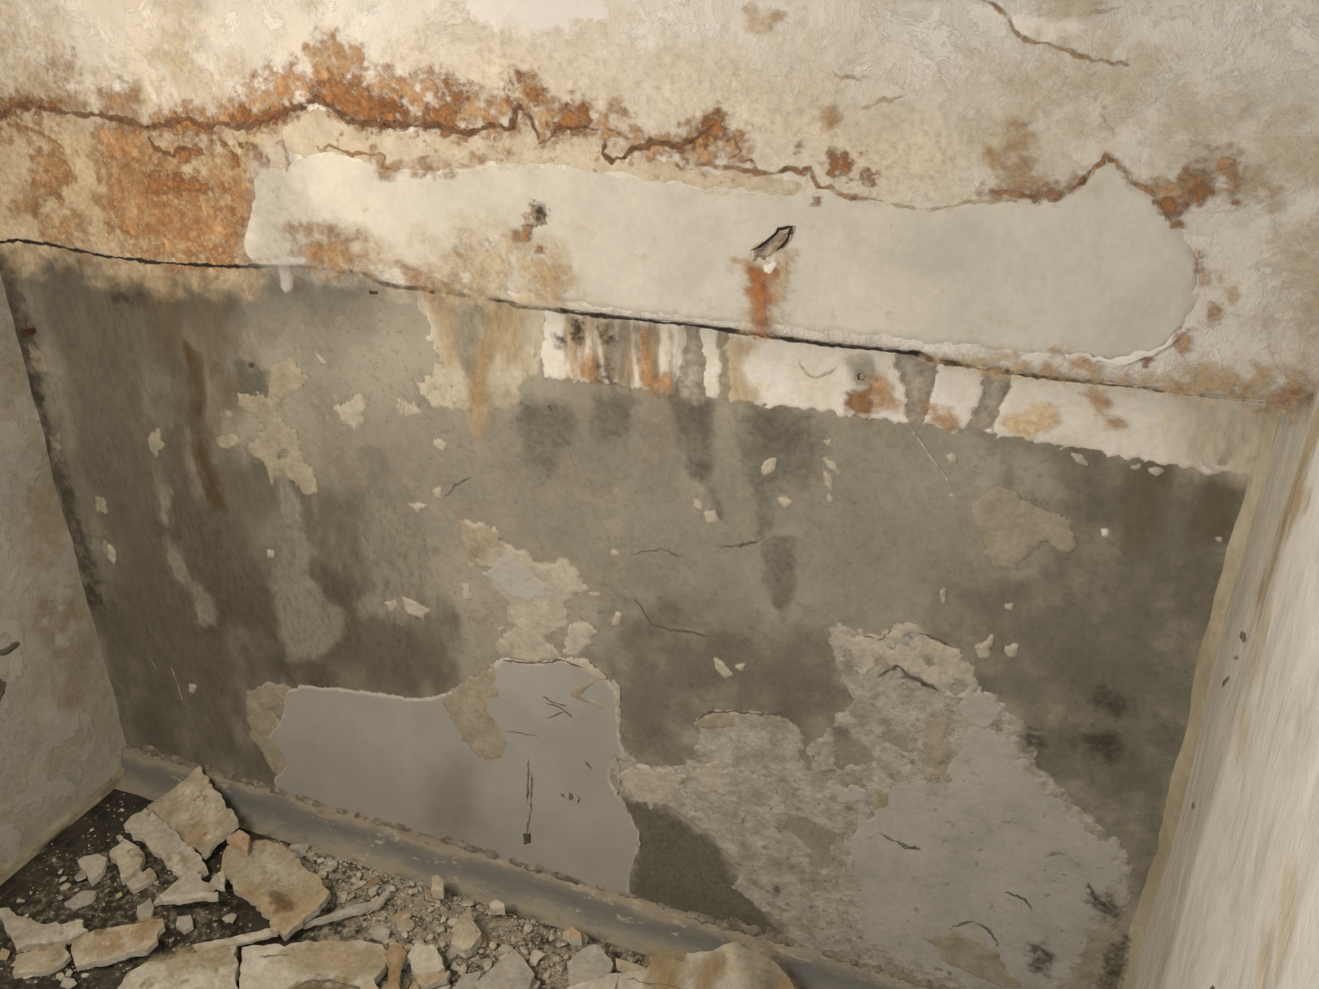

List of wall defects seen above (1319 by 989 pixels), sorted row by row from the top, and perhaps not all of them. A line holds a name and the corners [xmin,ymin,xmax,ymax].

rust [92,30,750,273]
leakage [461,34,965,198]
crack [982,0,1128,67]
leakage [0,62,446,779]
peeling [215,357,319,496]
rust [563,314,675,395]
crack [0,238,1294,405]
spalling [733,225,794,340]
leakage [729,342,816,526]
rust [844,376,899,417]
peeling [442,519,622,762]
peeling [611,622,1133,989]